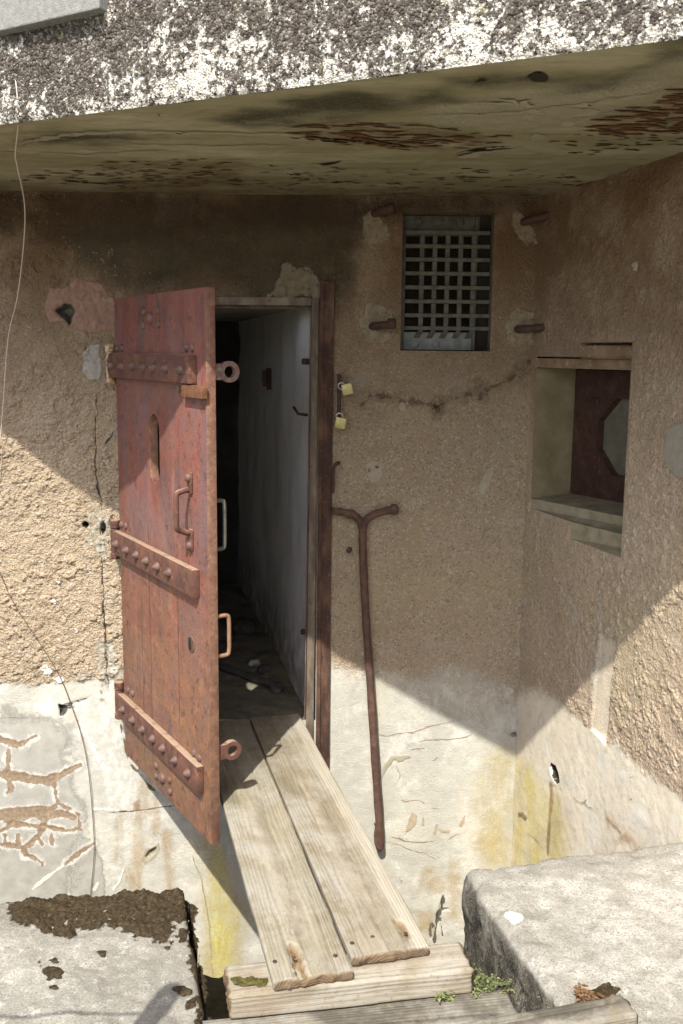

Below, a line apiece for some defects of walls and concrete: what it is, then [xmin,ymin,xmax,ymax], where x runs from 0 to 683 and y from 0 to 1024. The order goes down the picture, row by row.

rust [286,123,511,150]
rust [551,89,683,155]
rust [26,159,272,189]
spalling [266,262,320,298]
crack [58,396,124,716]
crack [378,722,472,809]
peeling [0,705,105,904]
crack [387,833,460,859]